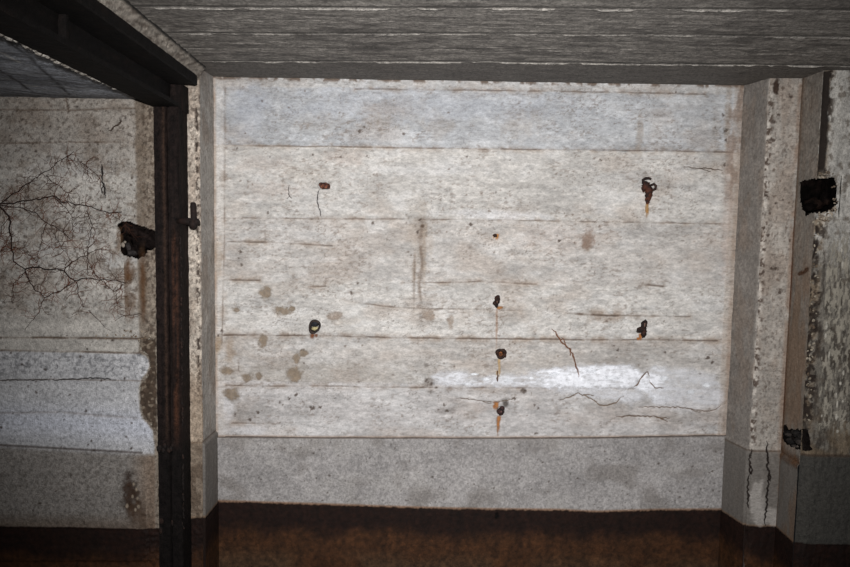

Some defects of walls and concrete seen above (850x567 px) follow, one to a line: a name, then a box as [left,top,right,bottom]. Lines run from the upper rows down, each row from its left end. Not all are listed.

crack [99,166,107,198]
hole [117,221,155,258]
peeling [783,171,850,451]
efflorescence [433,365,670,403]
crack [551,328,720,422]
crack [747,441,771,526]